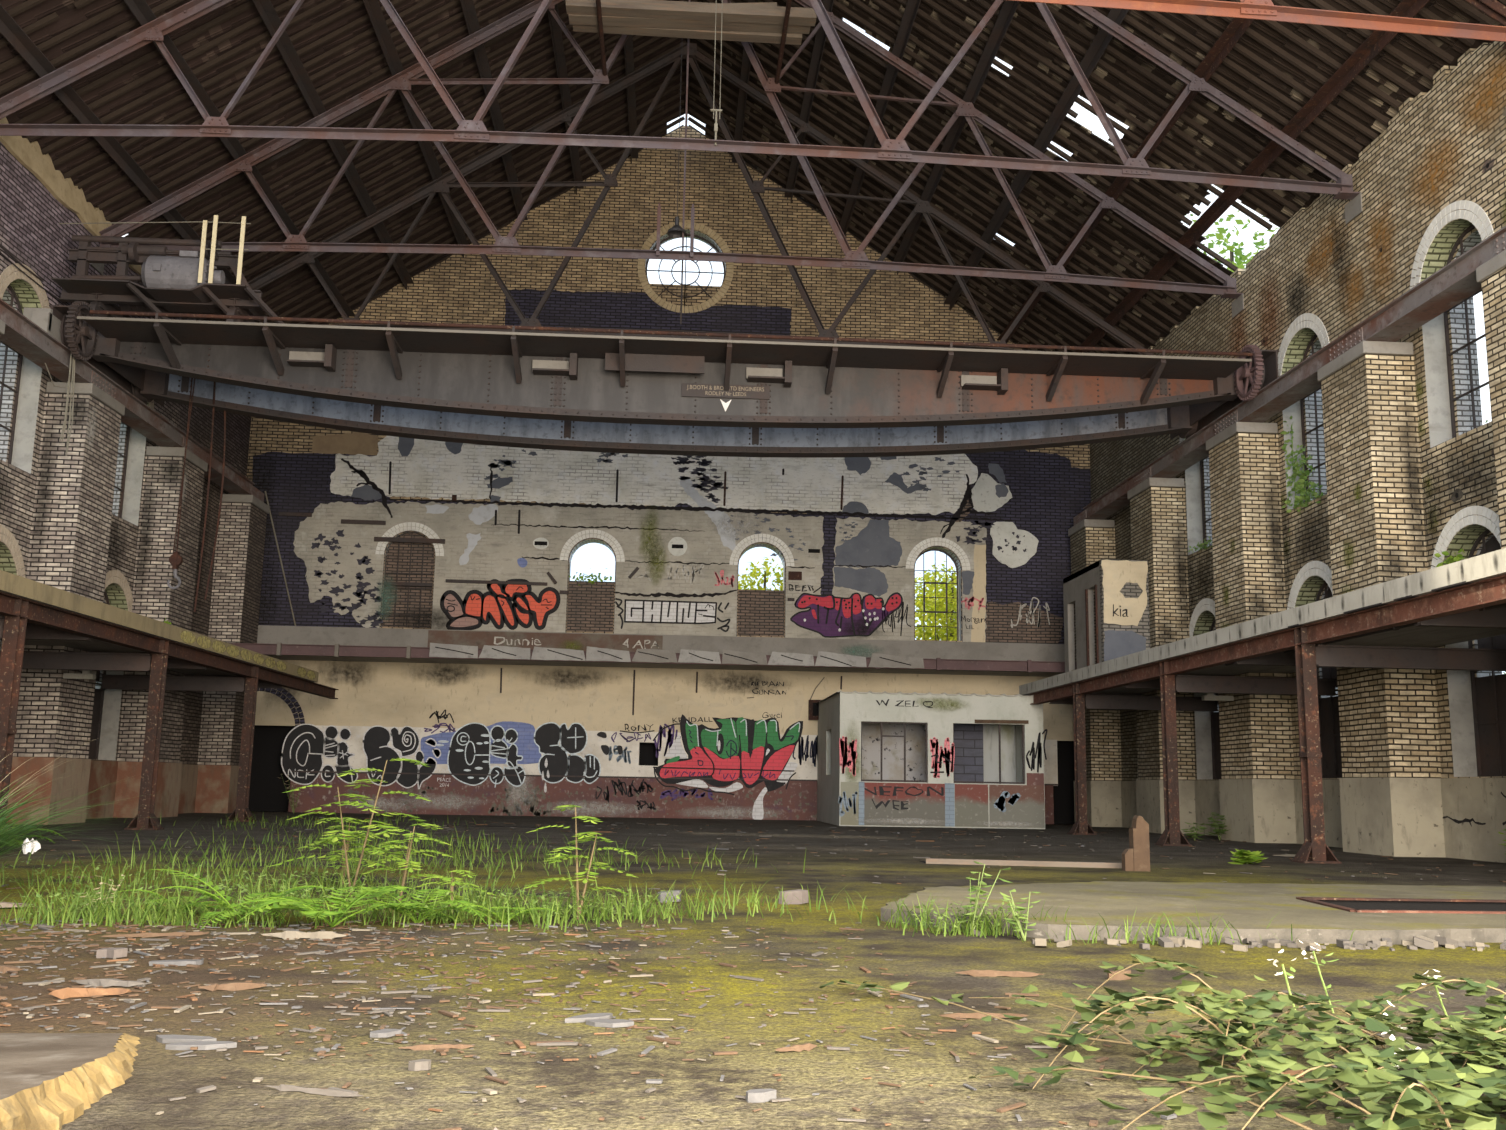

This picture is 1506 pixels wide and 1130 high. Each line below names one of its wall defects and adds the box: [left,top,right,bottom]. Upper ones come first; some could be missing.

peeling [398,437,414,456]
peeling [445,442,463,454]
peeling [484,449,546,502]
peeling [596,452,628,463]
crack [341,458,1012,598]
peeling [671,455,806,560]
peeling [844,456,959,494]
peeling [955,499,1027,553]
peeling [995,483,1009,498]
crack [1443,792,1506,827]